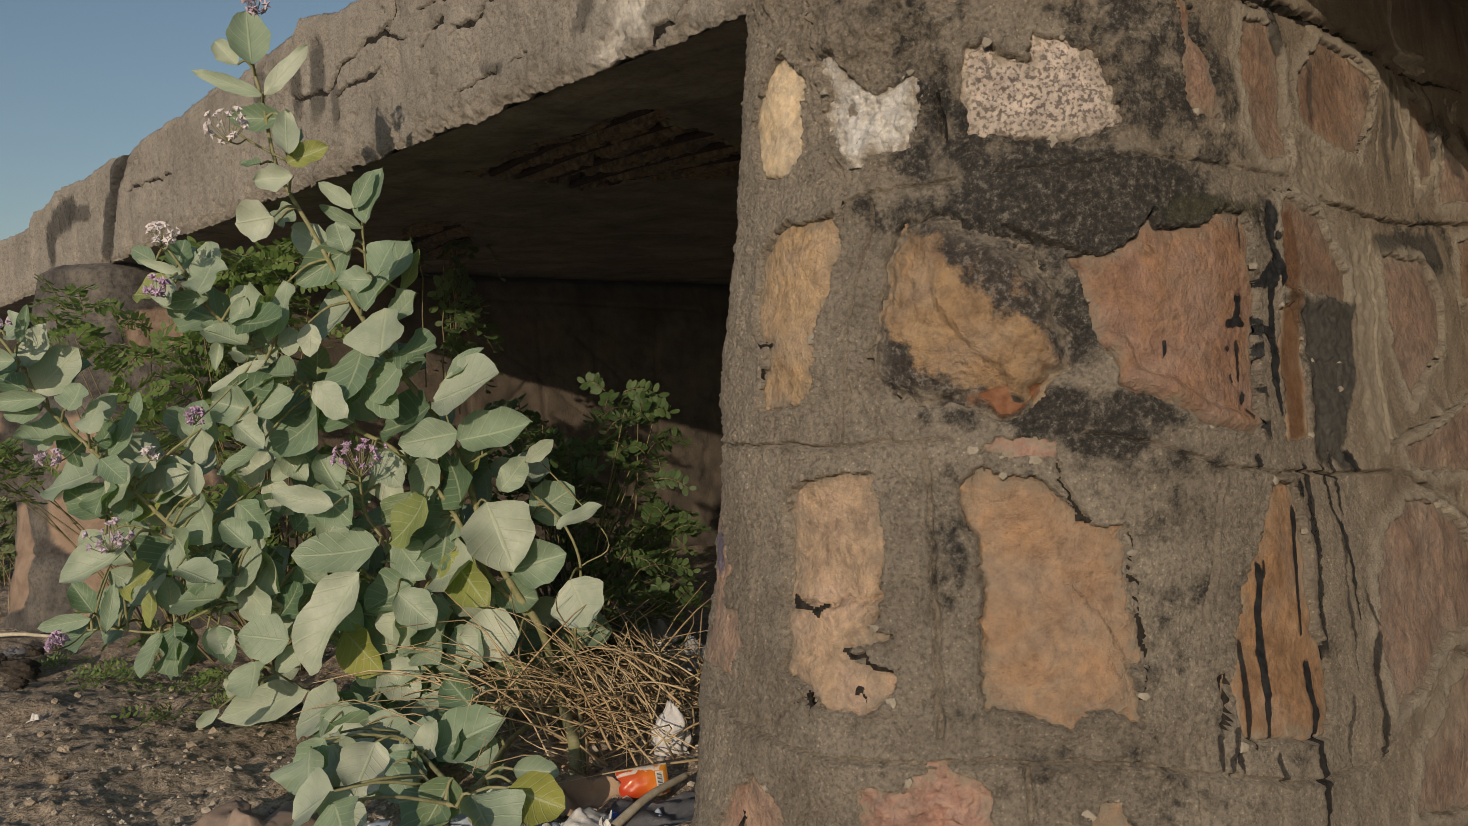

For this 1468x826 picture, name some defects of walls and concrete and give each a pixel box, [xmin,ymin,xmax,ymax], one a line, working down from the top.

crack [295,0,494,101]
crack [653,3,687,46]
crack [1240,0,1461,93]
spalling [457,109,741,191]
peeling [758,48,923,179]